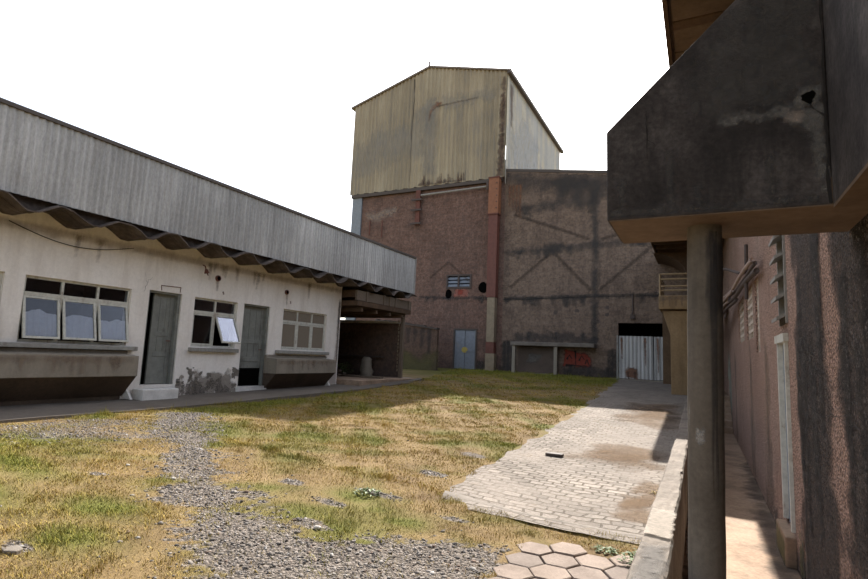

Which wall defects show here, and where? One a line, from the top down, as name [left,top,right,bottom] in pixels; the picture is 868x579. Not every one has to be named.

damp [691,0,829,192]
spalling [798,86,820,105]
peeling [175,367,239,395]
damp [790,214,868,579]